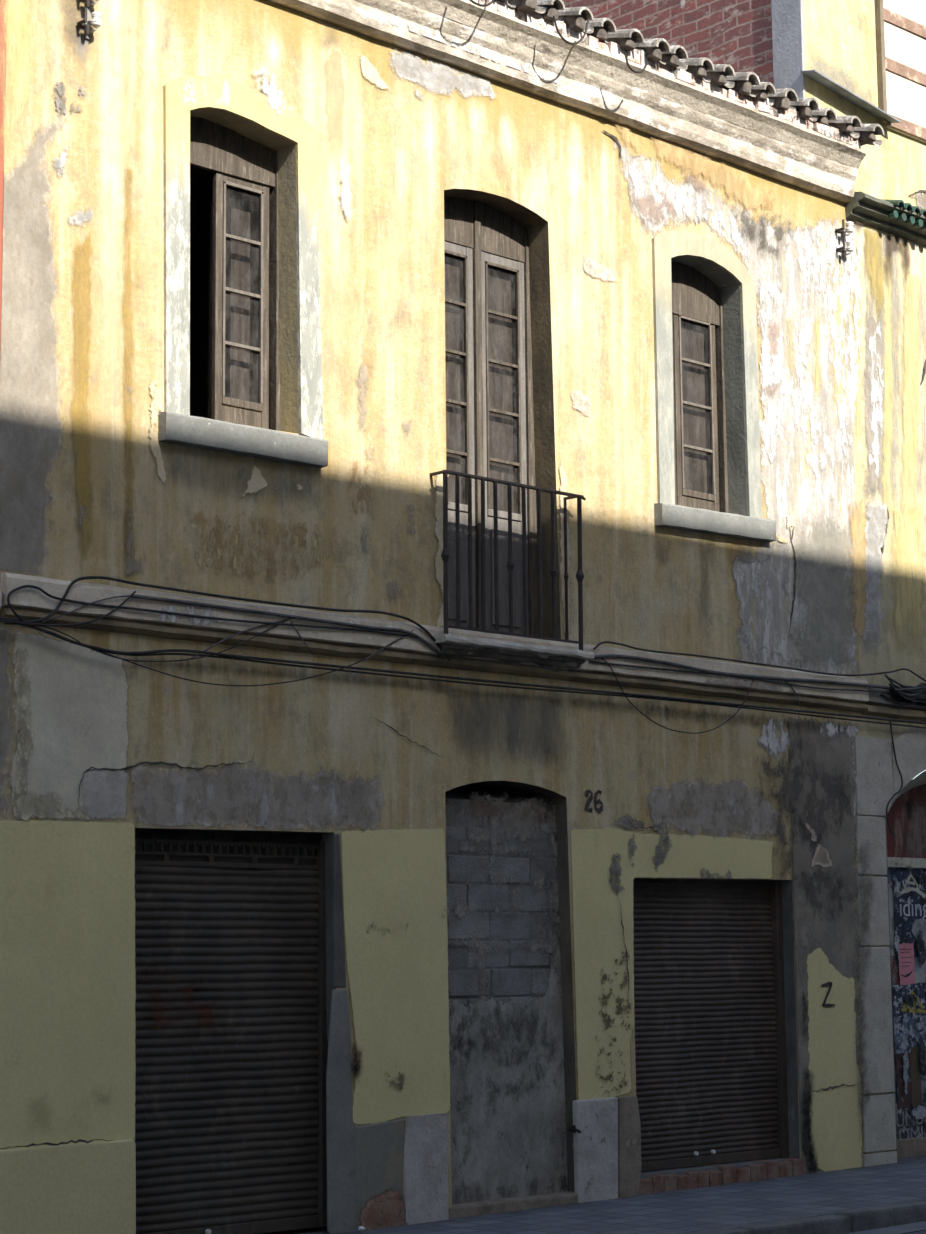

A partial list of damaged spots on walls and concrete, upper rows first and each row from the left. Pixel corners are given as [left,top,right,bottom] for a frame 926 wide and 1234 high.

peeling [360,52,495,99]
spalling [68,209,93,224]
peeling [0,82,85,575]
peeling [614,141,890,674]
spalling [707,677,782,691]
peeling [82,760,383,830]
peeling [609,815,672,893]
damp [741,718,872,966]
spalling [789,717,861,1174]
peeling [596,952,631,1093]
spalling [360,1189,408,1230]